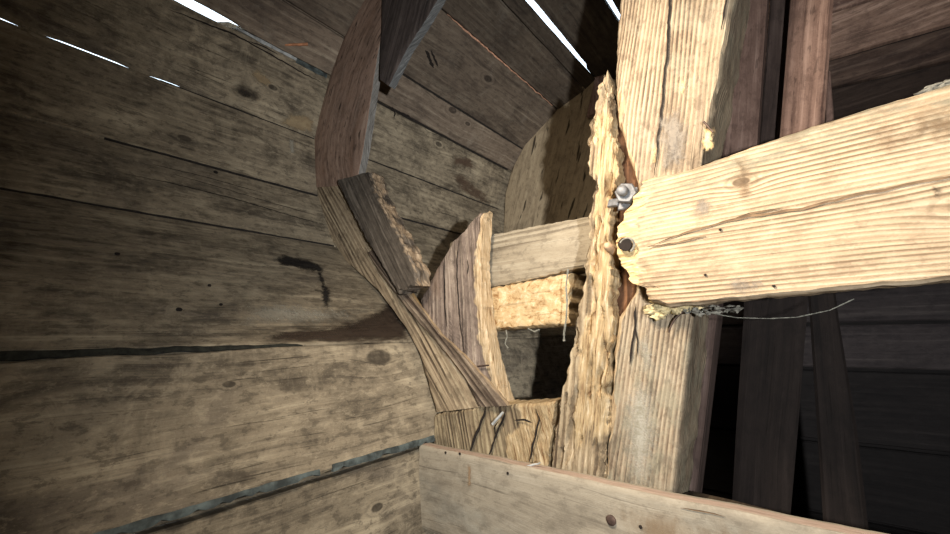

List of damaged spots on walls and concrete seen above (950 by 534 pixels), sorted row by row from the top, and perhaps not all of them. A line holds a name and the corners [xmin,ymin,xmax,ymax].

crack [654,0,671,175]
damp [248,255,407,342]
crack [470,408,540,462]